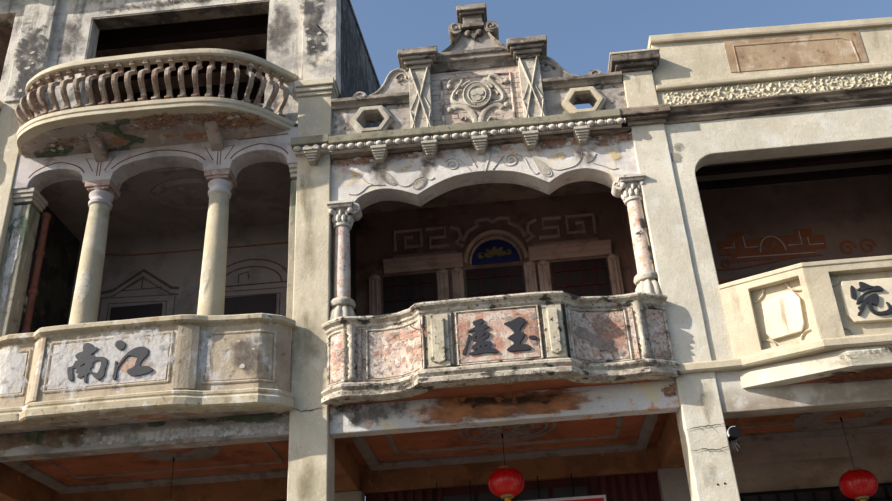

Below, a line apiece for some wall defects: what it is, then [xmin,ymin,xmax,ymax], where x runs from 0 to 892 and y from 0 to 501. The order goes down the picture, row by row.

leakage [269,0,327,64]
leakage [13,25,49,104]
peeling [34,138,78,158]
peeling [92,112,265,152]
peeling [575,315,626,355]
peeling [0,346,27,396]
peeling [41,327,175,393]
corrosion [421,388,587,424]
crack [687,423,730,452]